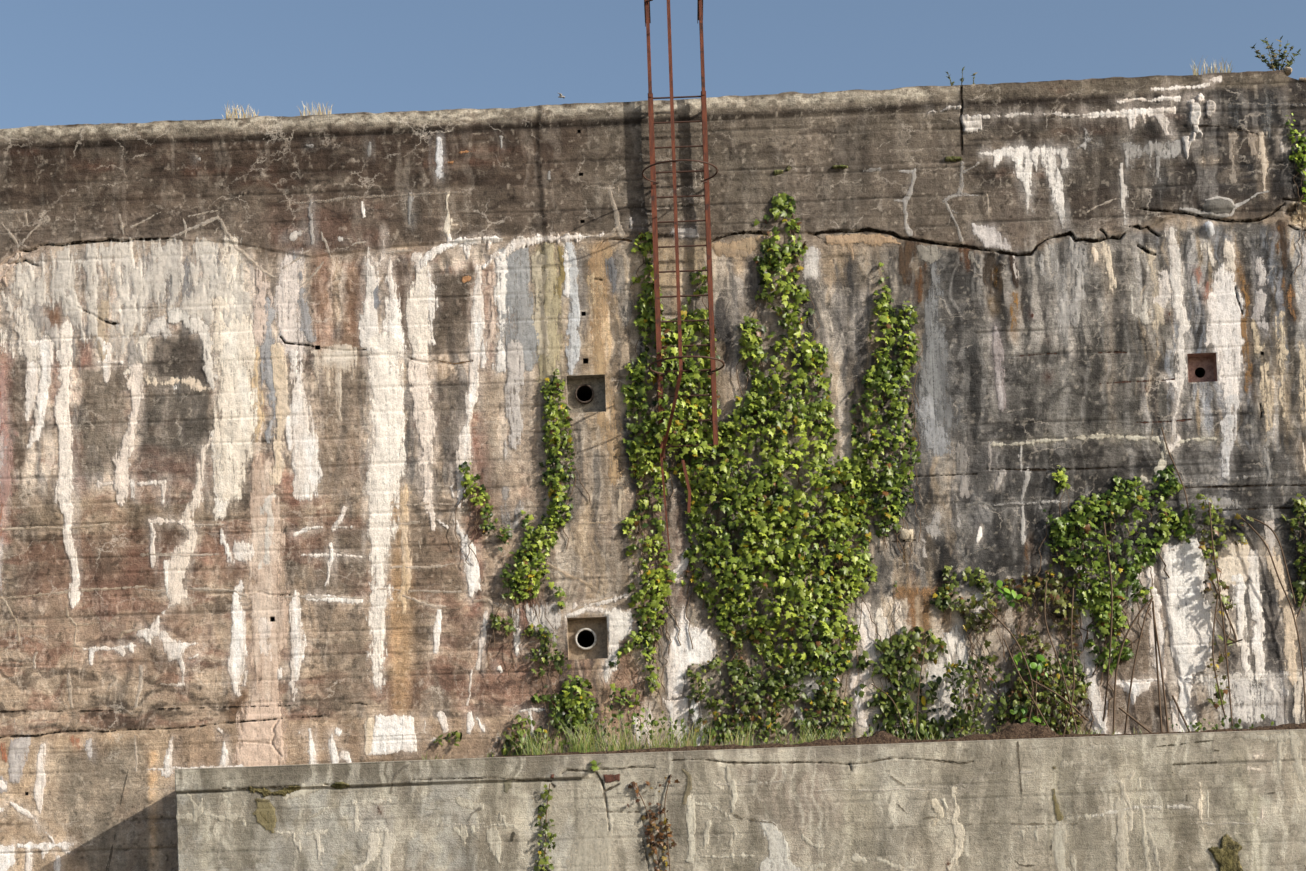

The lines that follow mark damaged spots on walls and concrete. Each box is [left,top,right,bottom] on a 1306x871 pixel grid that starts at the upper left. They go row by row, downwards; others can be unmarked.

crack [1198,124,1258,135]
crack [16,237,182,266]
crack [712,230,768,242]
crack [808,198,1306,257]
spalling [1291,201,1306,222]
damp [915,76,1306,793]
damp [898,512,941,558]
damp [788,601,971,732]
damp [0,734,74,871]
damp [282,783,328,800]
damp [352,798,396,871]
damp [452,796,515,864]